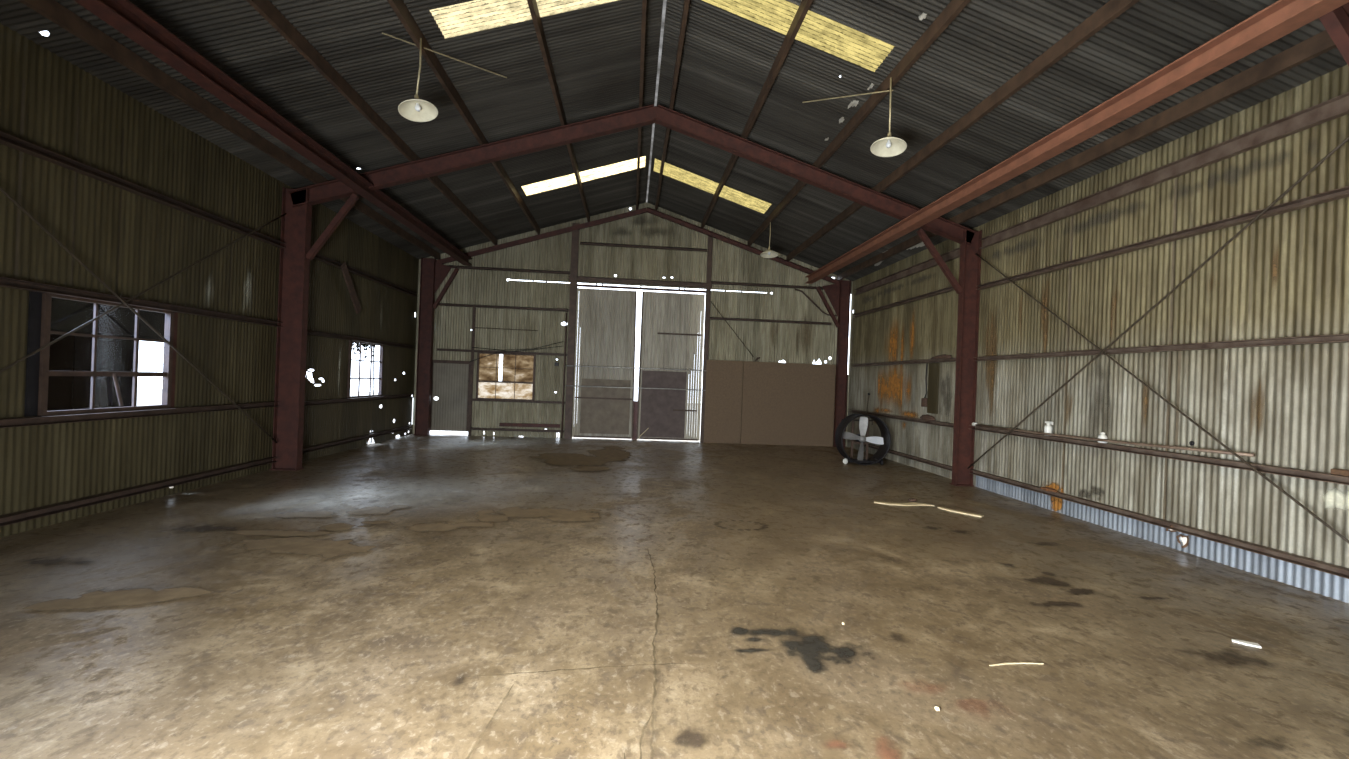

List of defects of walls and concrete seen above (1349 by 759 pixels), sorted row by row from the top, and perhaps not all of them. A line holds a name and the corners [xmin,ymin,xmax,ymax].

corrosion [875,317,916,427]
corrosion [1040,482,1064,511]
crack [624,561,683,759]
damp [736,637,768,652]